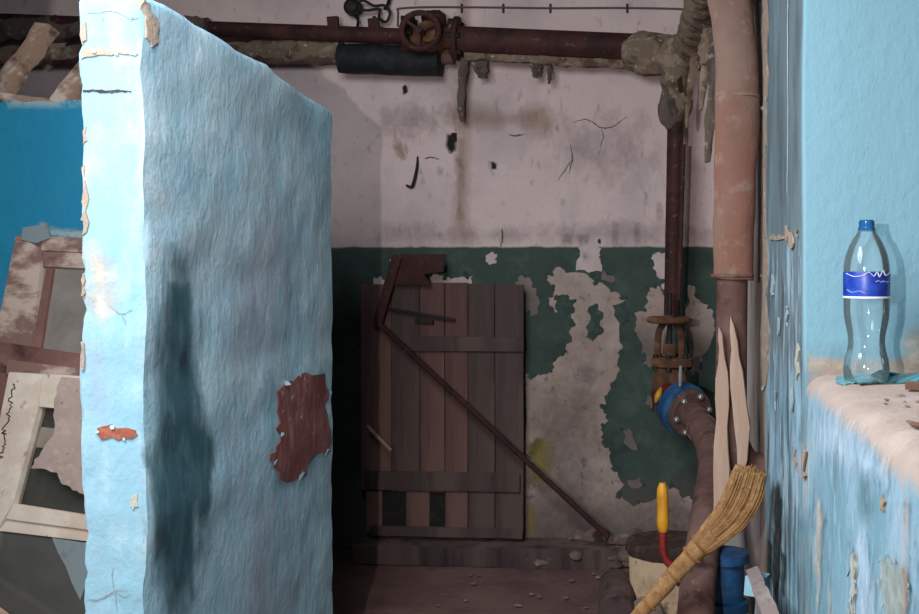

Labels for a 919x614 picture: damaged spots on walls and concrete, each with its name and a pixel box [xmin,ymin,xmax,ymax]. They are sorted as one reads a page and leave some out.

flaking render [80,22,138,60]
flaking render [137,0,159,47]
crack [83,87,131,95]
peeling [760,0,798,411]
peeling [426,271,472,284]
peeling [486,251,497,265]
peeling [684,282,716,375]
flaking render [95,424,138,441]
leakage [151,254,213,611]
peeling [269,372,332,483]
peeling [515,239,693,539]
leakage [767,483,784,600]